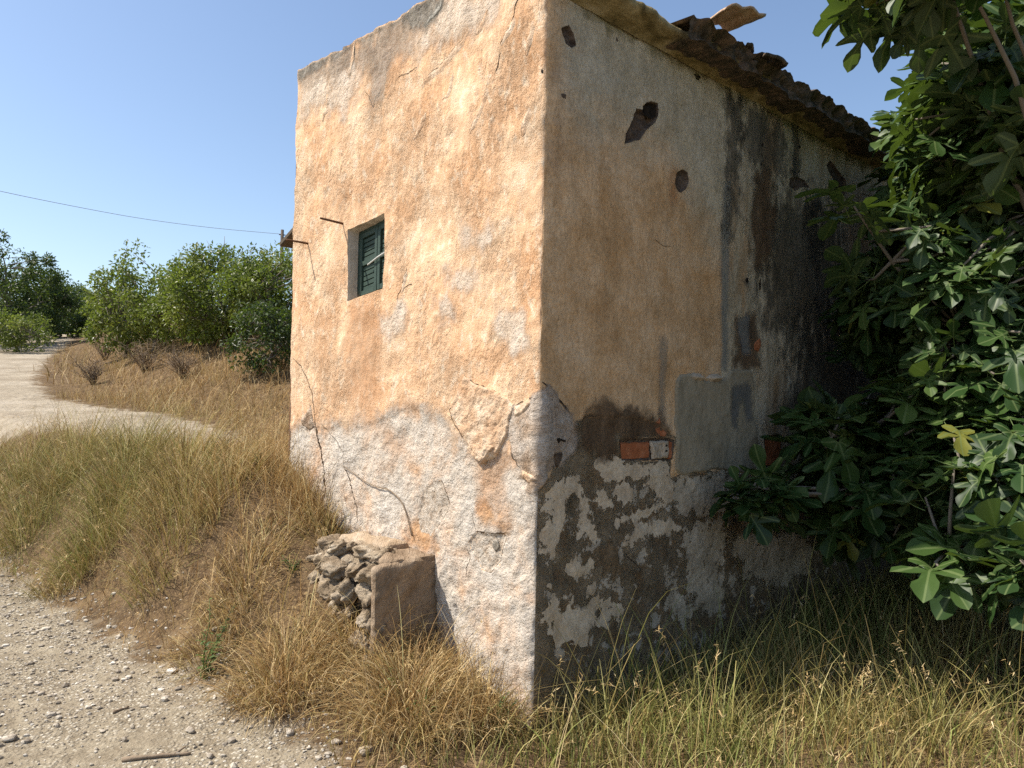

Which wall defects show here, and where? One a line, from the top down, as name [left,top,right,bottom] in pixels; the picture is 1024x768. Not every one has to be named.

spalling [561,25,576,47]
spalling [625,101,659,143]
spalling [675,169,689,192]
water stain [720,83,879,367]
water stain [756,200,882,414]
crack [294,359,358,521]
peeling [289,376,904,731]
water stain [581,400,685,556]
water stain [580,538,686,644]